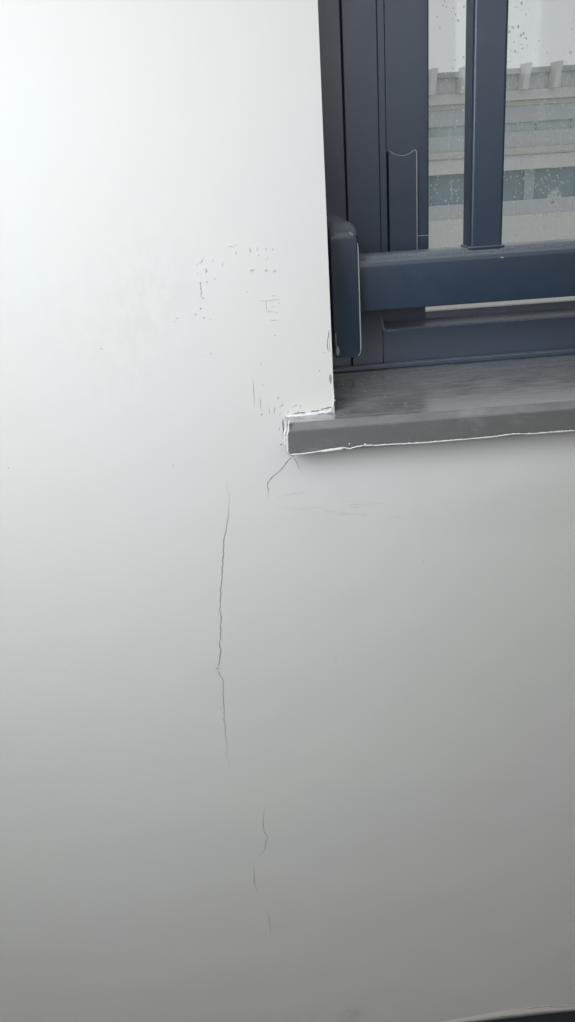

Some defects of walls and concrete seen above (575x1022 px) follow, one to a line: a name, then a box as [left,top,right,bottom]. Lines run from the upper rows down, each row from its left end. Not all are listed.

crack [217,515,229,723]